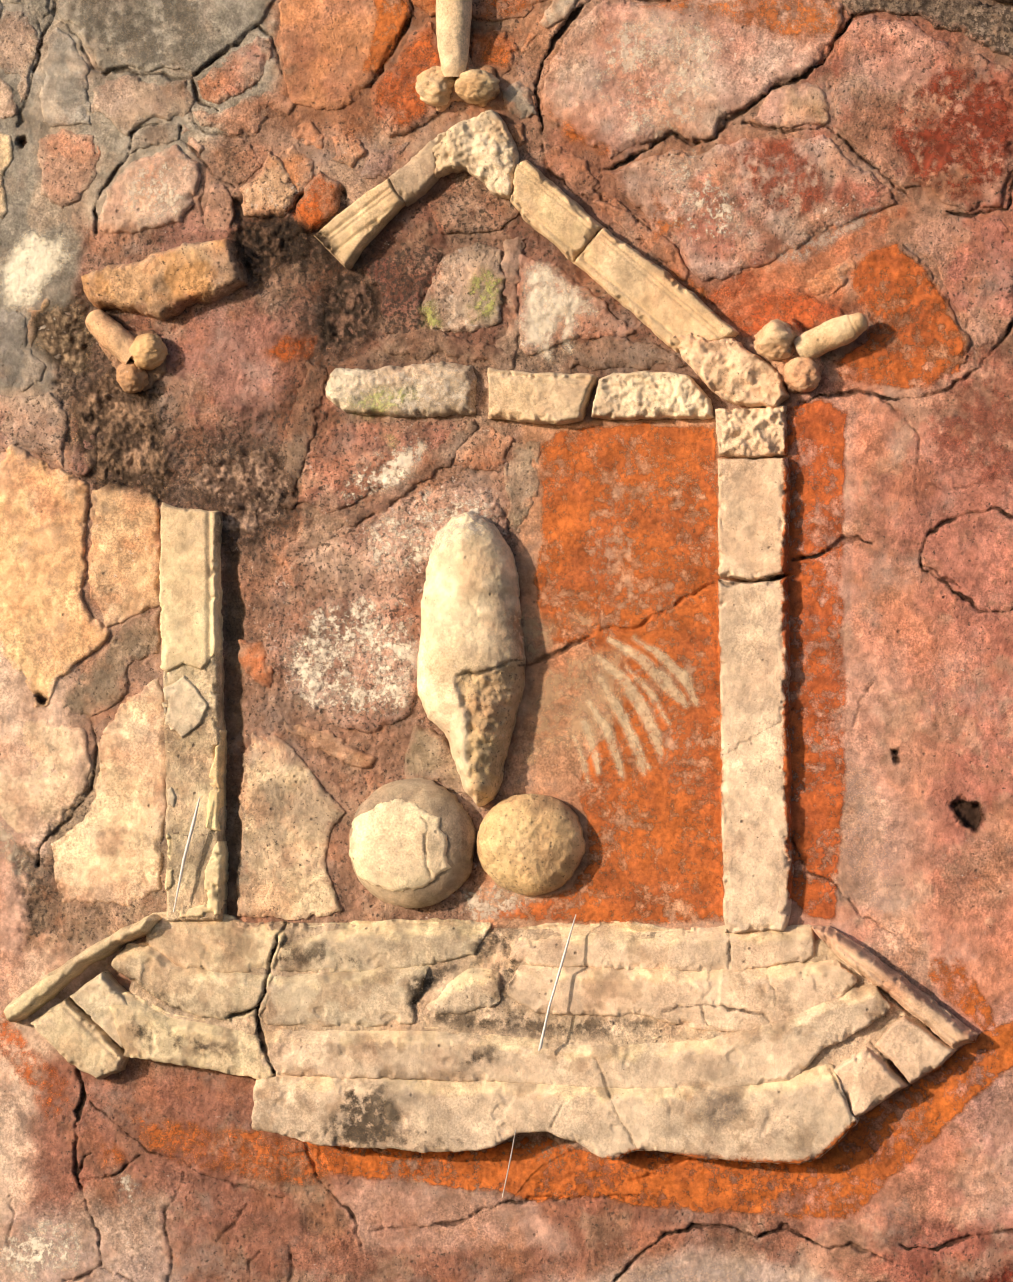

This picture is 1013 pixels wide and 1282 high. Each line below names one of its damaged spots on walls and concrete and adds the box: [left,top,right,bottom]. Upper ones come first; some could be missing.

crack [998,507,1013,519]
crack [758,550,828,581]
crack [920,518,1013,613]
crack [75,1076,104,1122]
crack [73,1139,156,1185]
crack [328,1190,357,1228]
crack [614,1223,829,1282]
crack [901,1239,963,1252]